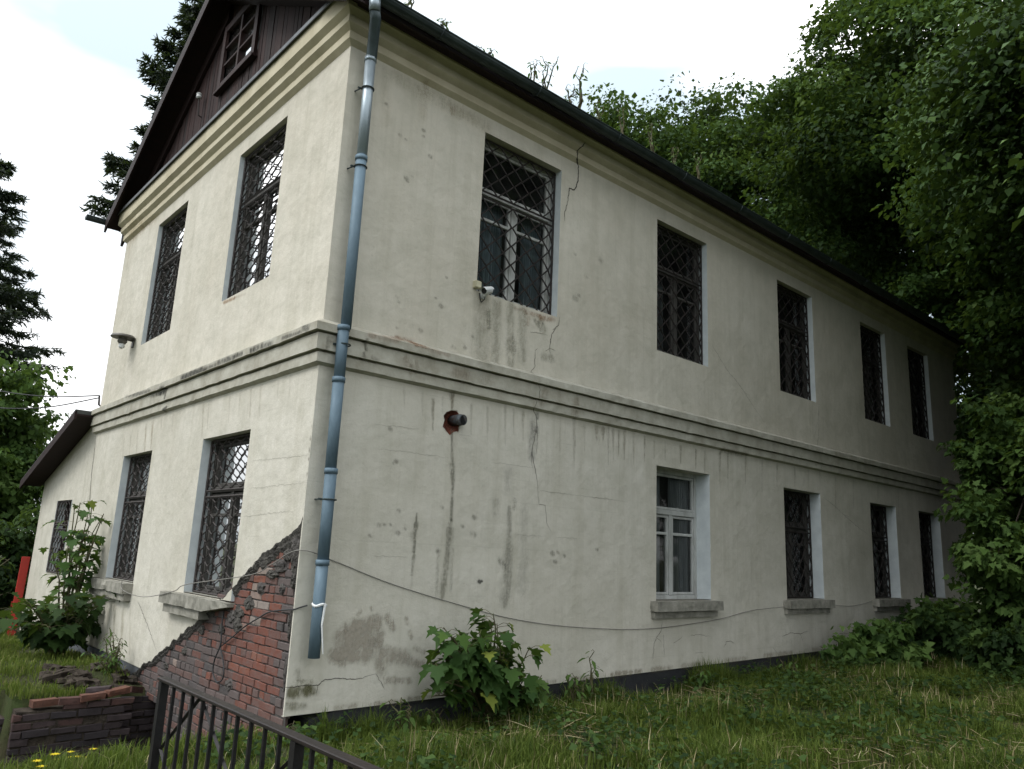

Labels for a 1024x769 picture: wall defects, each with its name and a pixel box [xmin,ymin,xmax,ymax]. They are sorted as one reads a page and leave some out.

crack [564,143,585,217]
crack [504,325,625,539]
flaking render [131,517,303,742]